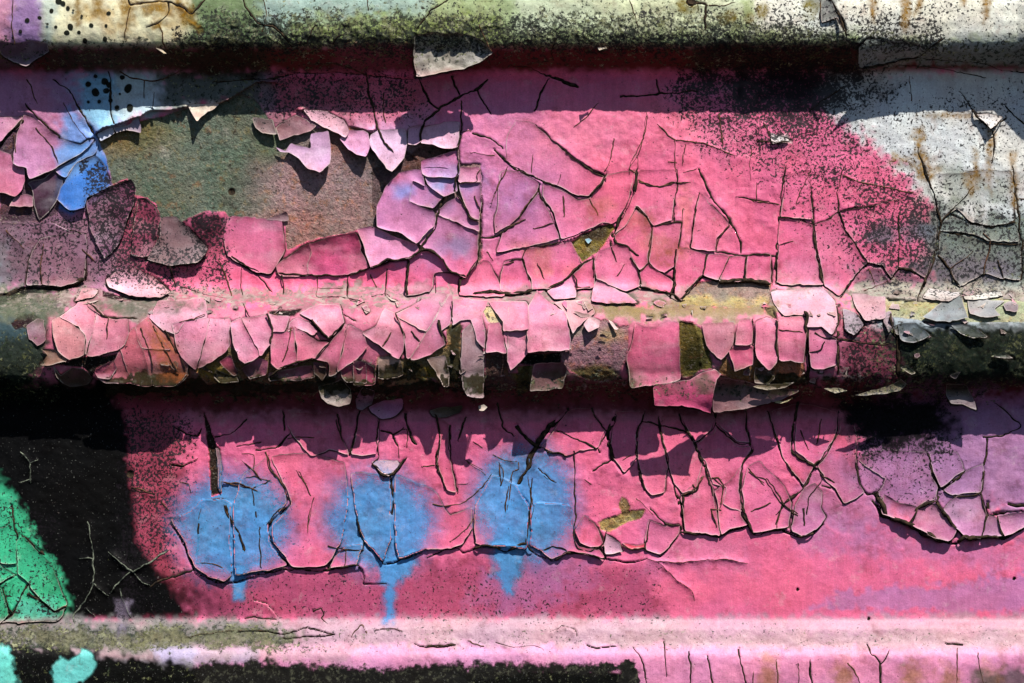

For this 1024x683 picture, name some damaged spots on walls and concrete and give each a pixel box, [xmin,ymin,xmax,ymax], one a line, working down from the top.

crack [0,0,1024,395]
peeling [0,94,1024,581]
crack [0,402,845,628]
crack [855,403,1024,545]
crack [688,651,713,683]
crack [737,649,813,683]
crack [847,644,890,683]
crack [945,642,984,683]